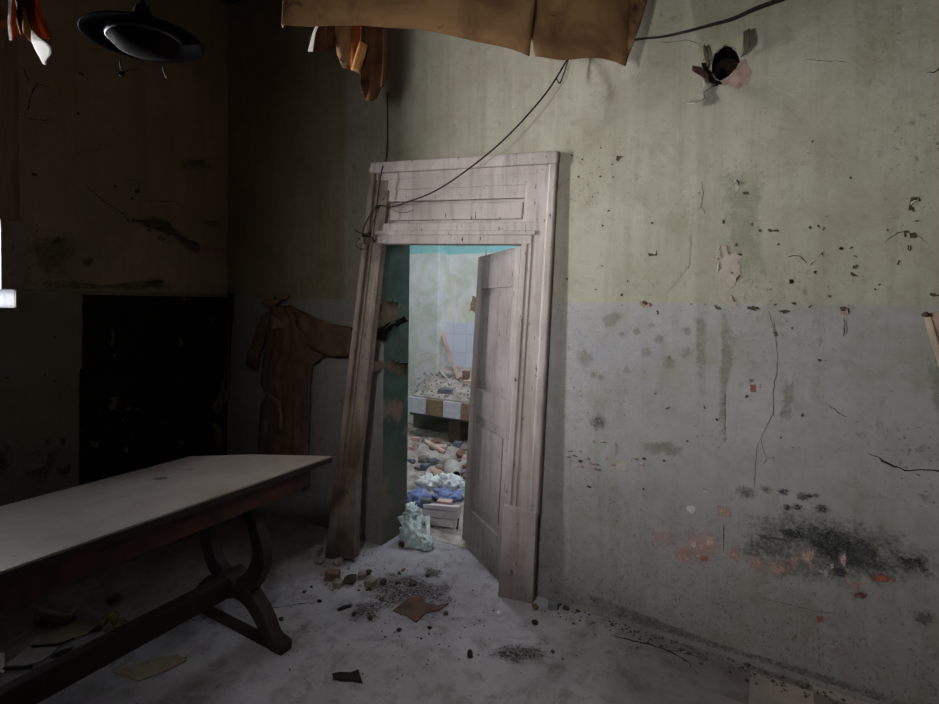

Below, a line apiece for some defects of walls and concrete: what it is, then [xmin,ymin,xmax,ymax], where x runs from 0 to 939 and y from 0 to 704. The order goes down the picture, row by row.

spalling [686,28,752,104]
crack [85,177,224,256]
peeling [713,243,760,311]
flaking render [376,316,408,344]
flaking render [373,358,409,379]
crack [754,311,778,486]
crack [868,453,939,472]
damp [750,489,928,584]